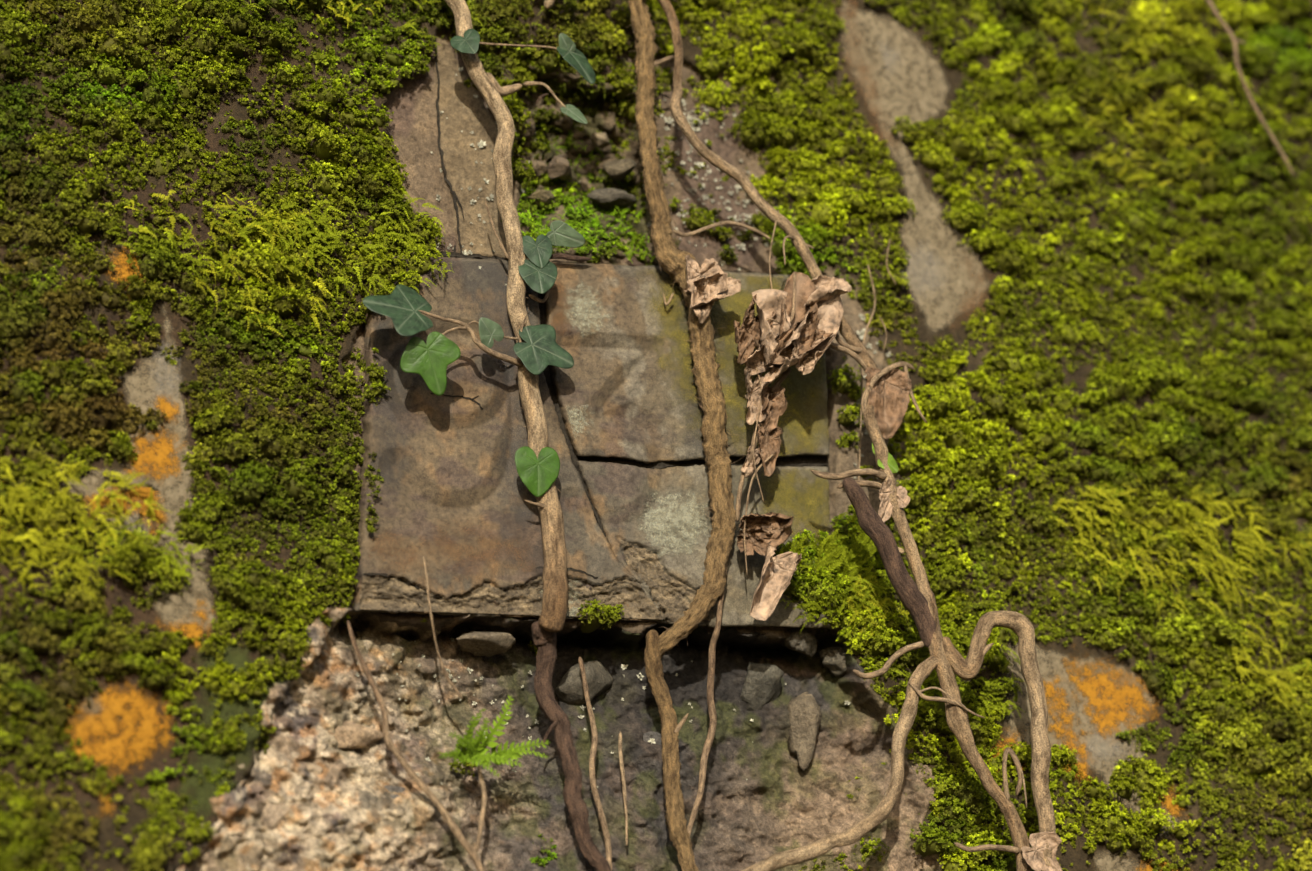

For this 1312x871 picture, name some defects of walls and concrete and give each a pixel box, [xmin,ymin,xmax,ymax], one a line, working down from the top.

crack [422,38,504,260]
crack [538,293,546,324]
crack [543,365,828,537]
spalling [176,540,946,871]